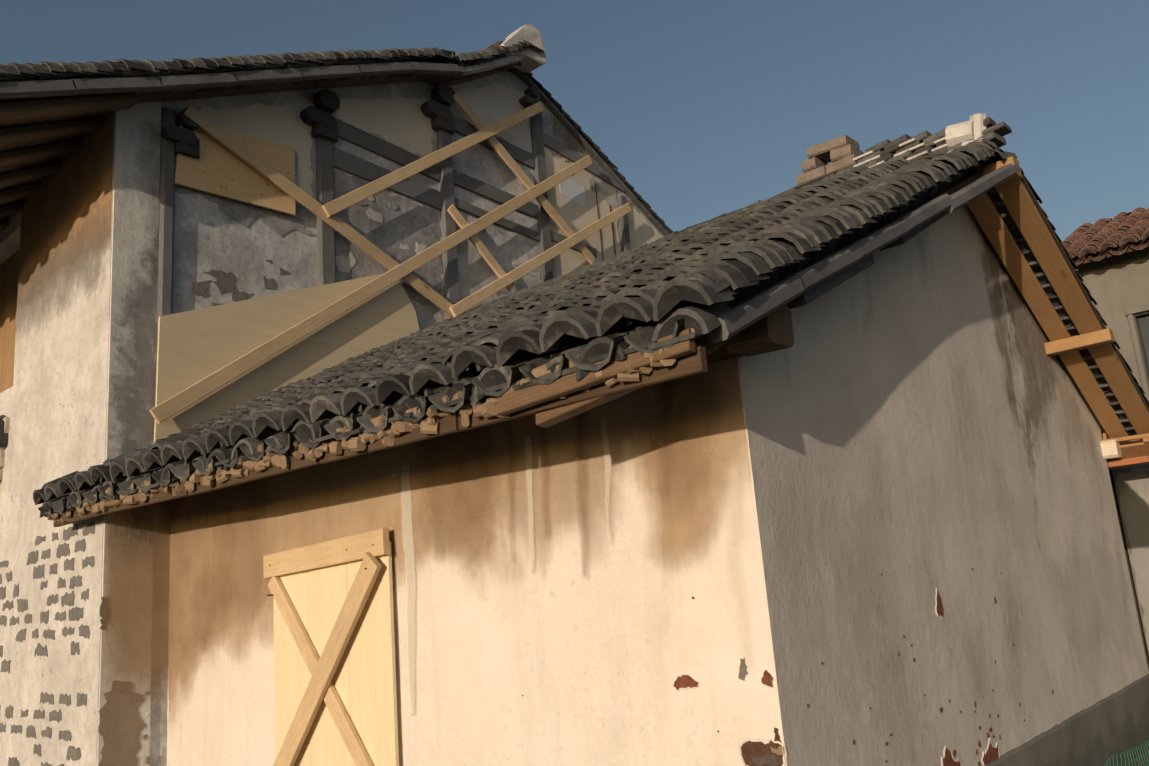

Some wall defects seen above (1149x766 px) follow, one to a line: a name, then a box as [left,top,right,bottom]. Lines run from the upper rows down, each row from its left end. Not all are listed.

peeling [175,185,317,237]
peeling [356,185,398,223]
flaking render [193,260,289,306]
peeling [335,233,356,273]
peeling [457,223,537,296]
leakage [105,357,747,715]
peeling [0,522,108,674]
spalling [935,588,944,619]
spalling [673,673,701,691]
peeling [0,680,151,766]
spalling [940,700,1001,766]